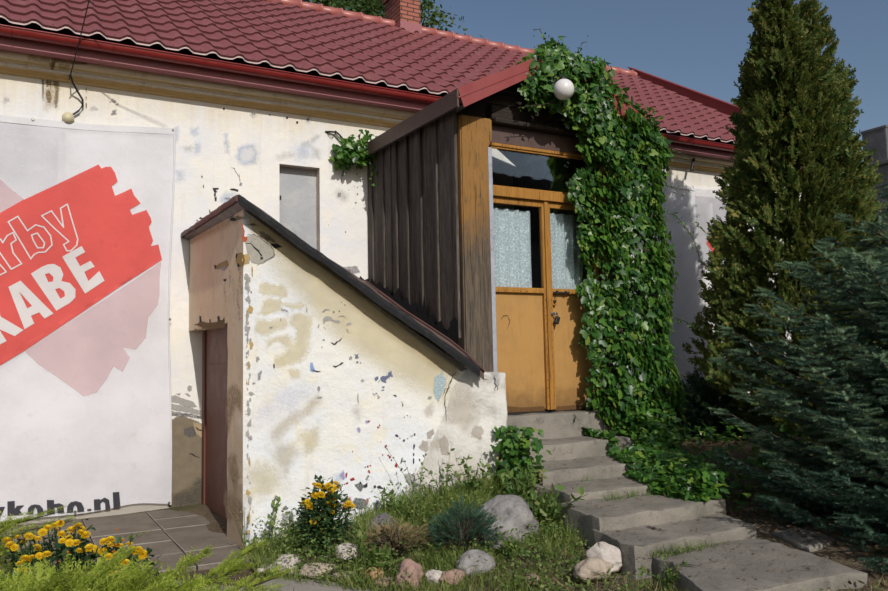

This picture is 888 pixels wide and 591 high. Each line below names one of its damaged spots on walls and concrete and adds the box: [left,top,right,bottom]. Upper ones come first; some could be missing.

leakage [42,79,59,106]
leakage [51,58,87,69]
peeling [214,224,351,465]
flaking render [169,385,202,508]